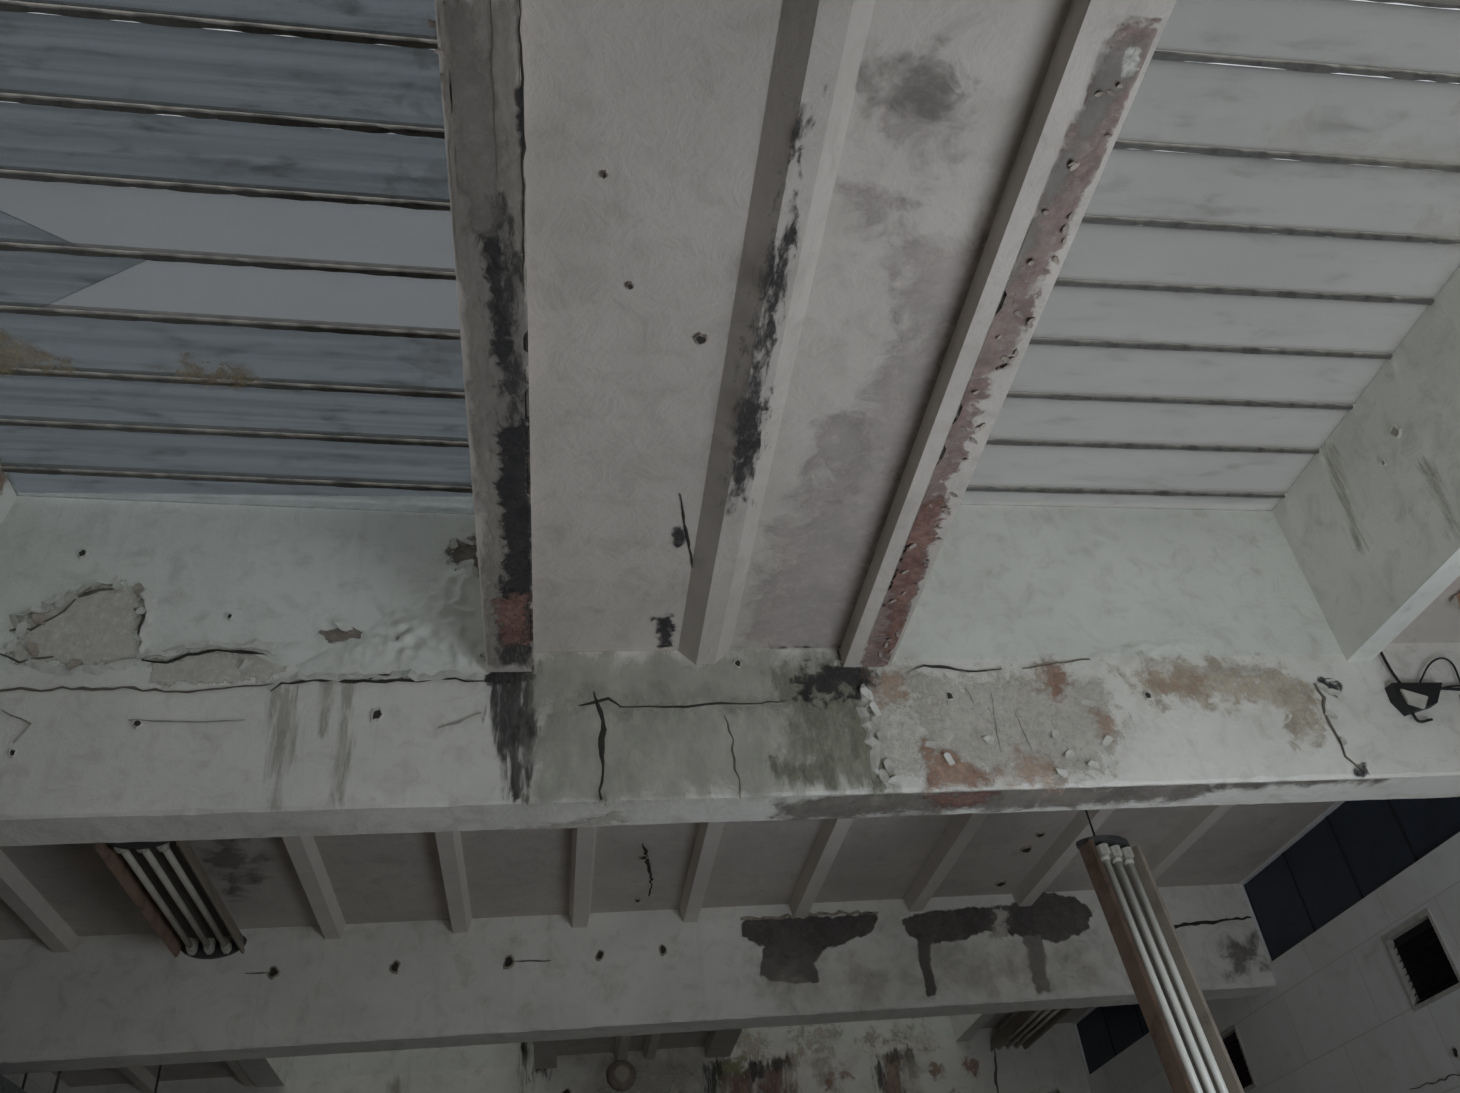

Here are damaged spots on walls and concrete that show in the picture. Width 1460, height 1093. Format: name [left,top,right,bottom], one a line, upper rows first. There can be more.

water stain [439,0,1388,821]
peeling [856,19,1161,793]
flaking render [0,575,287,686]
crack [578,691,786,806]
peeling [740,910,879,984]
peeling [902,892,1092,997]